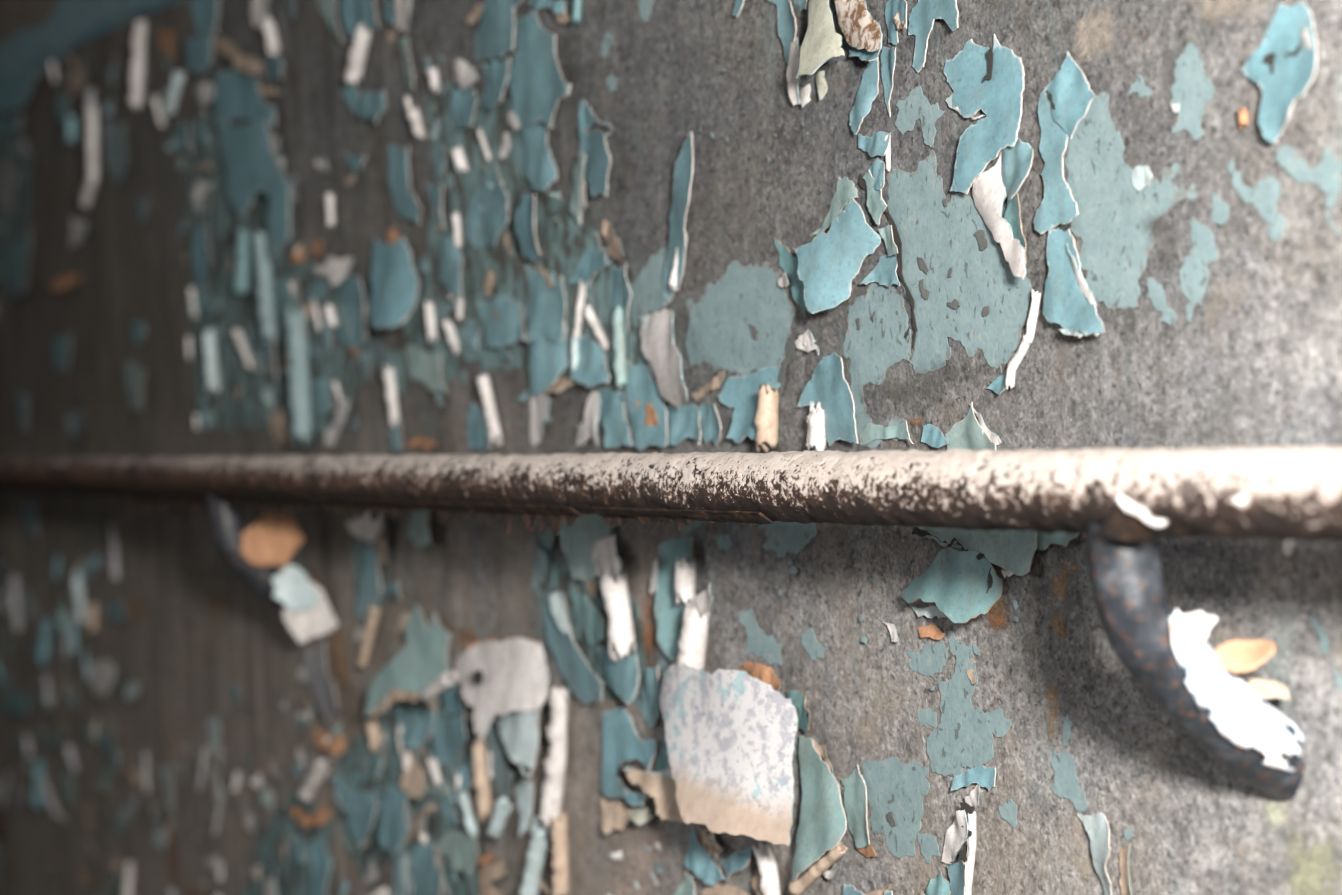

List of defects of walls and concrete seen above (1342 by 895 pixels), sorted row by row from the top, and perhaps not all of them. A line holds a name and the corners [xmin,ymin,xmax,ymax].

peeling [1241,1,1318,143]
peeling [0,0,781,453]
peeling [768,0,1003,451]
peeling [944,34,1106,395]
peeling [1131,165,1153,191]
peeling [0,510,895,895]
peeling [883,622,899,642]
peeling [901,527,1079,640]
peeling [920,766,996,895]
peeling [1077,812,1136,895]